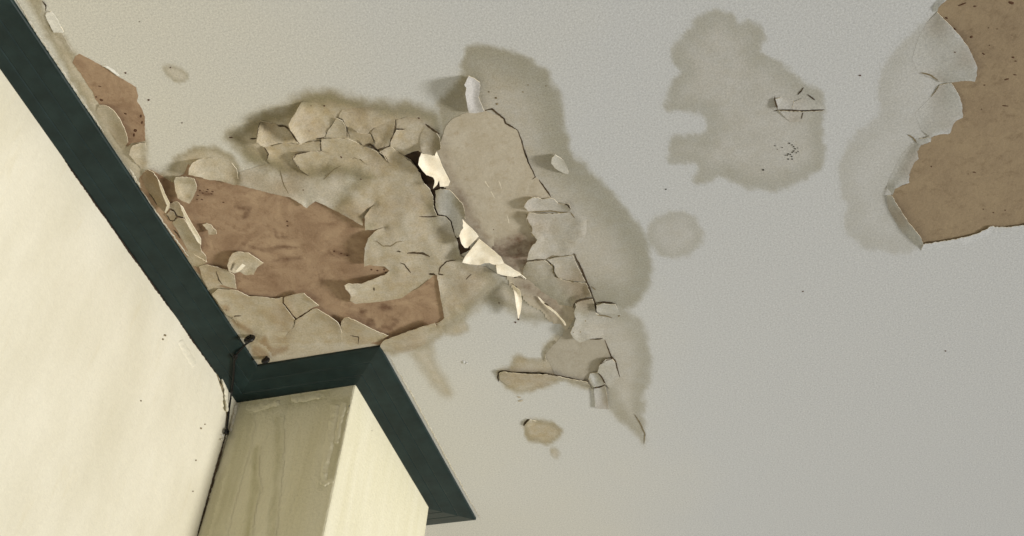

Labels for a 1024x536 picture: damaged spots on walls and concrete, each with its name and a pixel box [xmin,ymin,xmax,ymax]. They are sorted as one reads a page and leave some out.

peeling [32,0,621,410]
damp [20,0,708,450]
peeling [774,87,824,122]
damp [659,5,945,259]
peeling [887,0,1024,251]
flaking render [220,379,238,441]
damp [520,416,567,460]
crack [497,370,591,393]